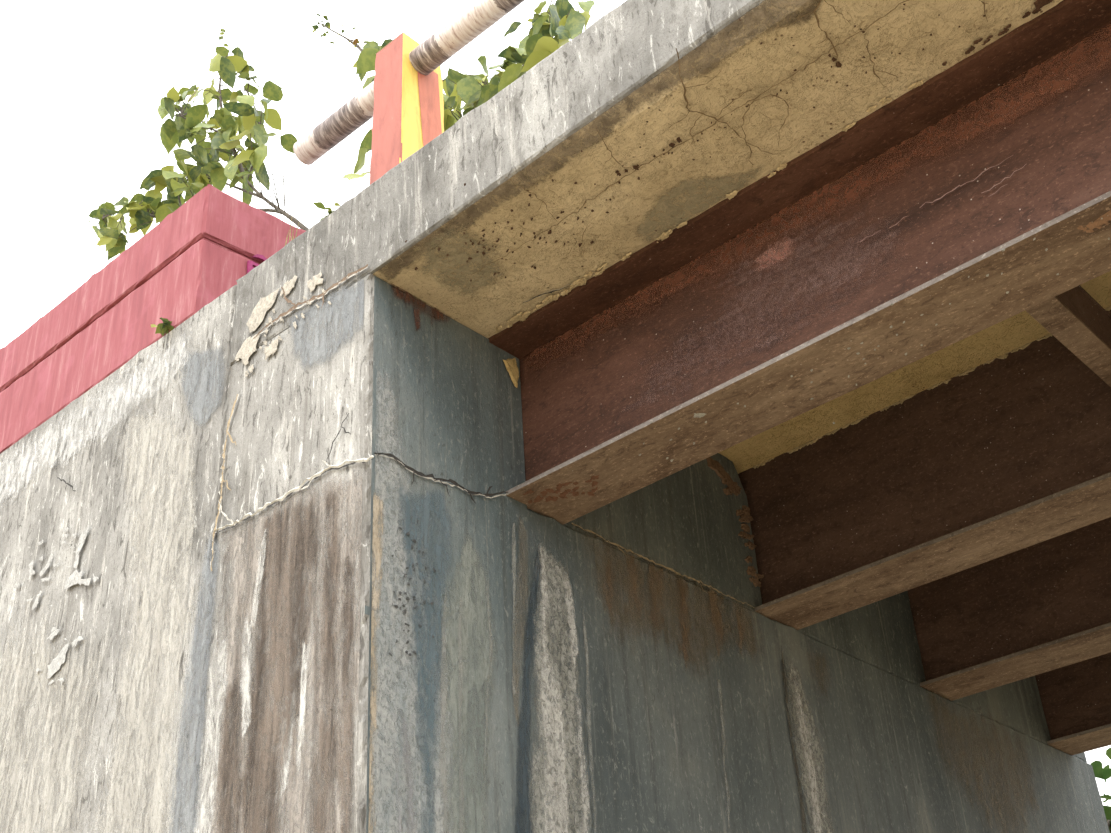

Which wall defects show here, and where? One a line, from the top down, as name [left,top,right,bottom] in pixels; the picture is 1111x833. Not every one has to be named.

crack [471,0,909,303]
rust [528,24,1111,368]
spalling [235,272,331,377]
crack [253,264,368,339]
peeling [0,337,188,502]
crack [210,394,509,570]
peeling [14,526,99,610]
peeling [36,627,83,685]
damp [99,349,496,833]
crack [572,523,754,609]